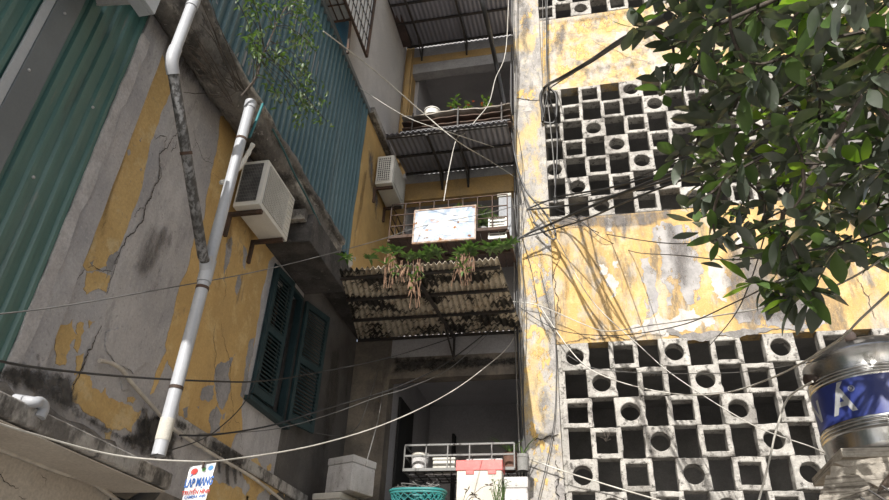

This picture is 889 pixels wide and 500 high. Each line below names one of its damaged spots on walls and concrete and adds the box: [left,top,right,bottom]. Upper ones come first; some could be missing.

peeling [541,12,627,84]
peeling [517,89,535,112]
peeling [83,55,170,295]
crack [77,133,214,290]
peeling [150,116,274,448]
peeling [599,261,619,297]
peeling [629,221,809,342]
leakage [0,367,80,418]
crack [73,326,102,390]
peeling [54,319,141,440]
leakage [91,409,187,459]